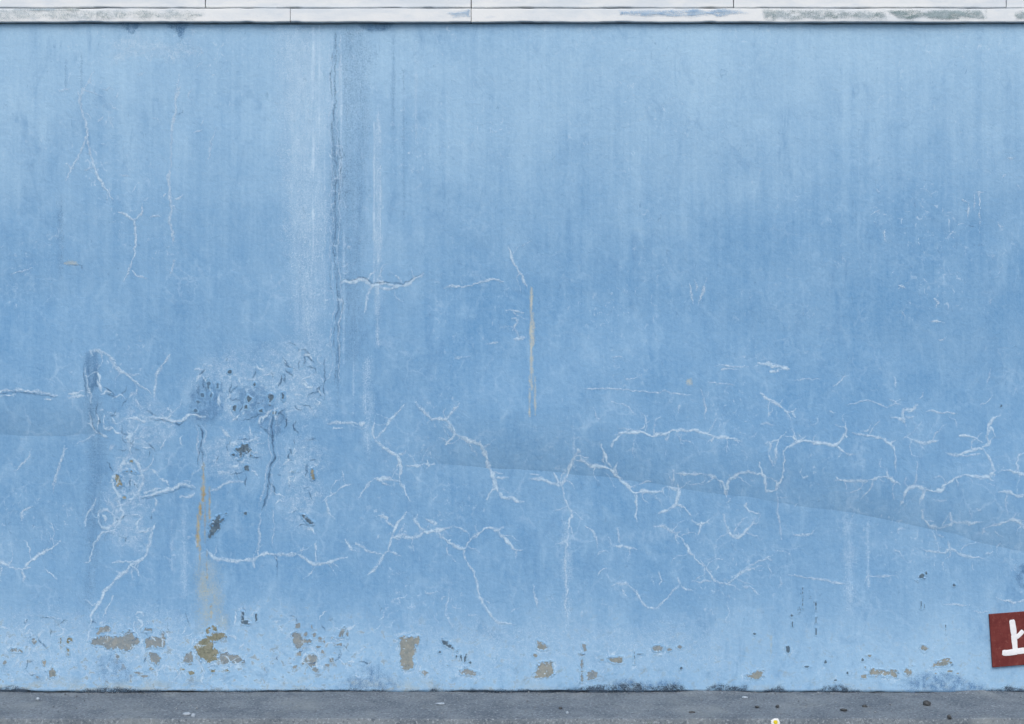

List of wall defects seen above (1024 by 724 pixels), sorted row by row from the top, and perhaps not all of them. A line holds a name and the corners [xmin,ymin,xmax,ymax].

crack [0,30,527,686]
corrosion [528,286,537,417]
spalling [230,381,287,417]
crack [530,361,1024,617]
peeling [58,621,171,680]
peeling [177,623,247,677]
peeling [288,621,351,674]
peeling [395,631,431,684]
peeling [436,635,483,683]
peeling [530,636,560,685]